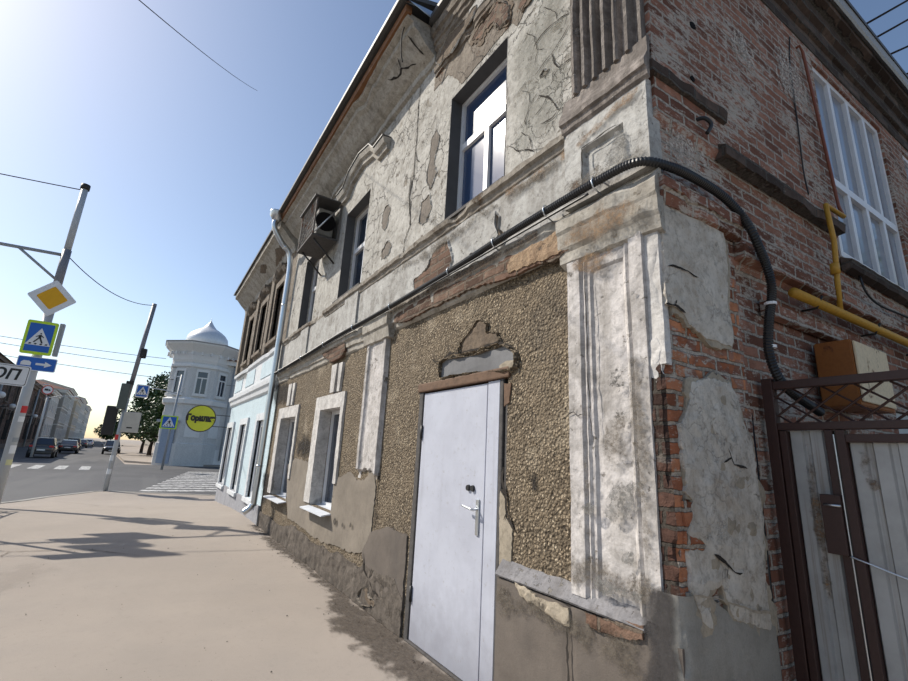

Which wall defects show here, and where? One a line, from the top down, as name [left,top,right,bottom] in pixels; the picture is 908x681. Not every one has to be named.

crack [388,35,424,80]
flaking render [435,0,532,66]
crack [507,7,571,151]
crack [403,88,421,252]
flaking render [413,239,454,290]
flaking render [649,338,668,507]
peeling [660,372,778,638]